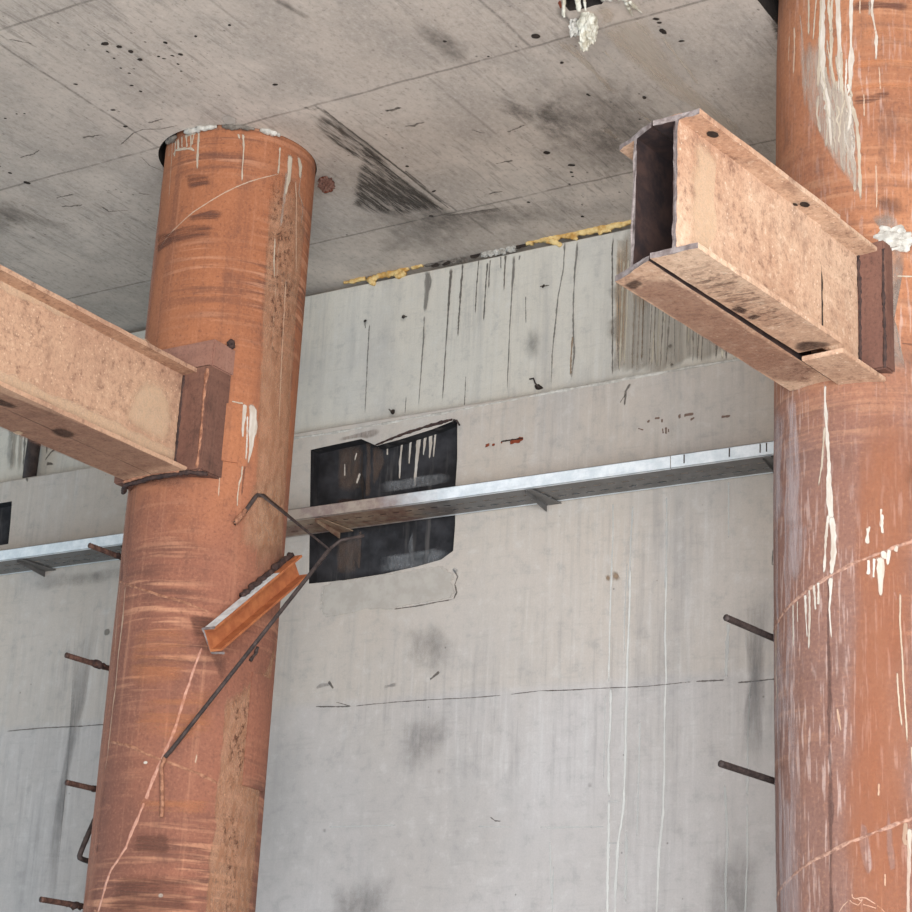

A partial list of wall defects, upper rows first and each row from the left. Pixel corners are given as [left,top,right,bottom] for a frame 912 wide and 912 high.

rust [271,196,292,355]
leakage [419,273,431,397]
leakage [443,264,463,391]
leakage [475,256,520,384]
leakage [540,244,578,376]
leakage [611,241,735,372]
rust [116,880,185,910]